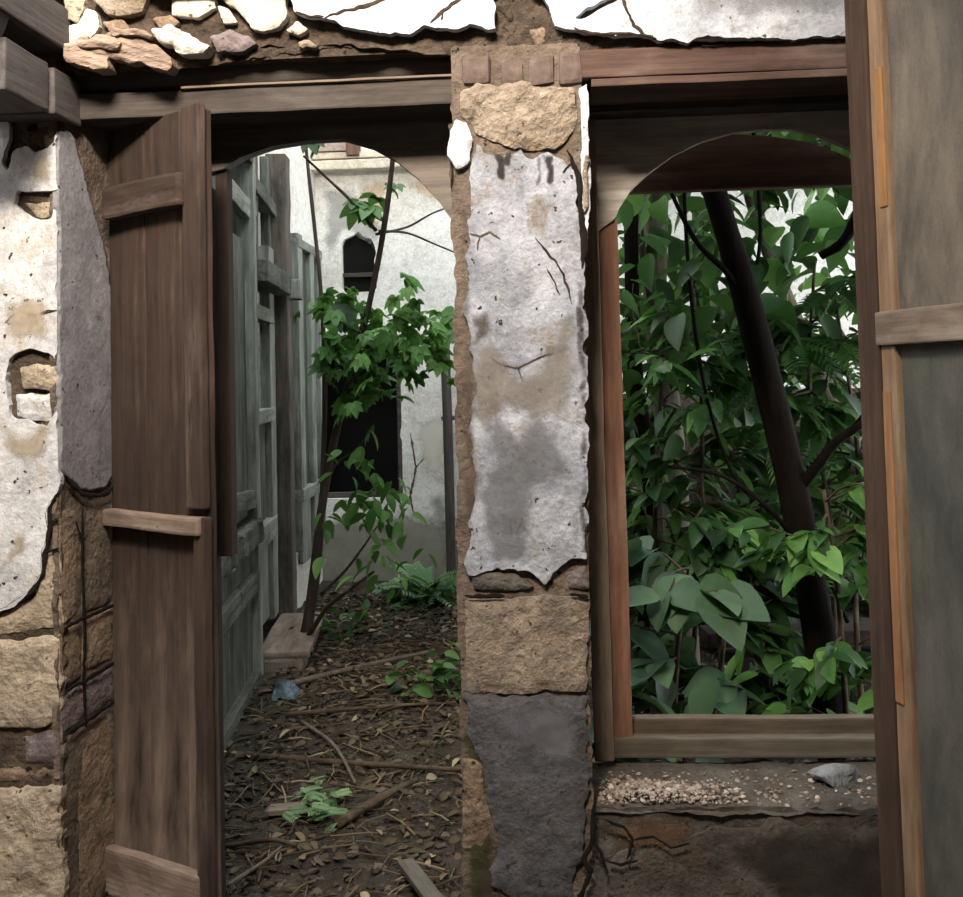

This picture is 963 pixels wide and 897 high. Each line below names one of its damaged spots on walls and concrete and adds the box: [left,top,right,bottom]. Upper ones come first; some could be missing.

crack [296,0,385,18]
crack [430,0,461,23]
flaking render [495,0,516,41]
flaking render [63,0,353,76]
flaking render [530,25,563,45]
flaking render [26,202,50,219]
crack [470,231,500,249]
crack [500,353,553,381]
flaking render [7,356,59,455]
crack [577,793,690,897]